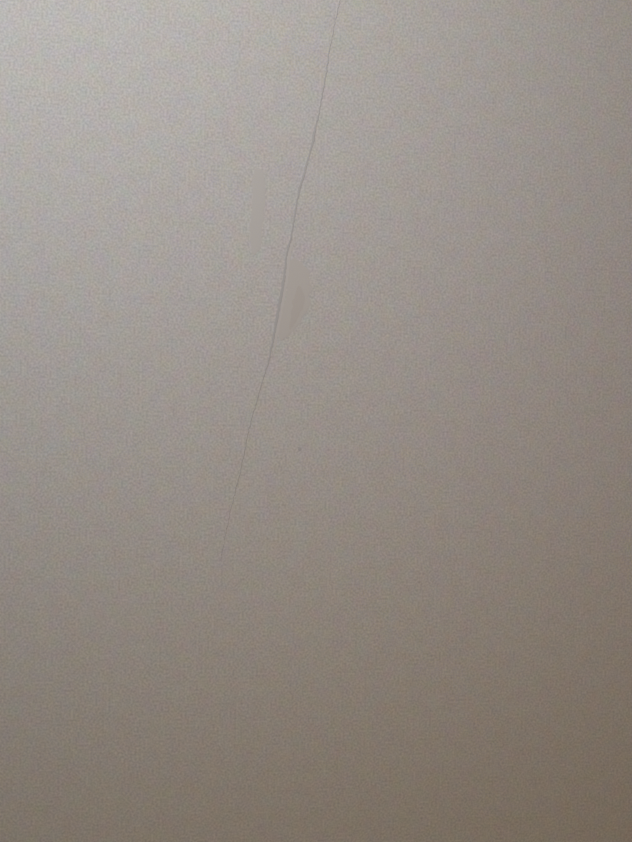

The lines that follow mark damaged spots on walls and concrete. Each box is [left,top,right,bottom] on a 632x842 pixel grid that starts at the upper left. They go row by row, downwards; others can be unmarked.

crack [221,0,340,554]